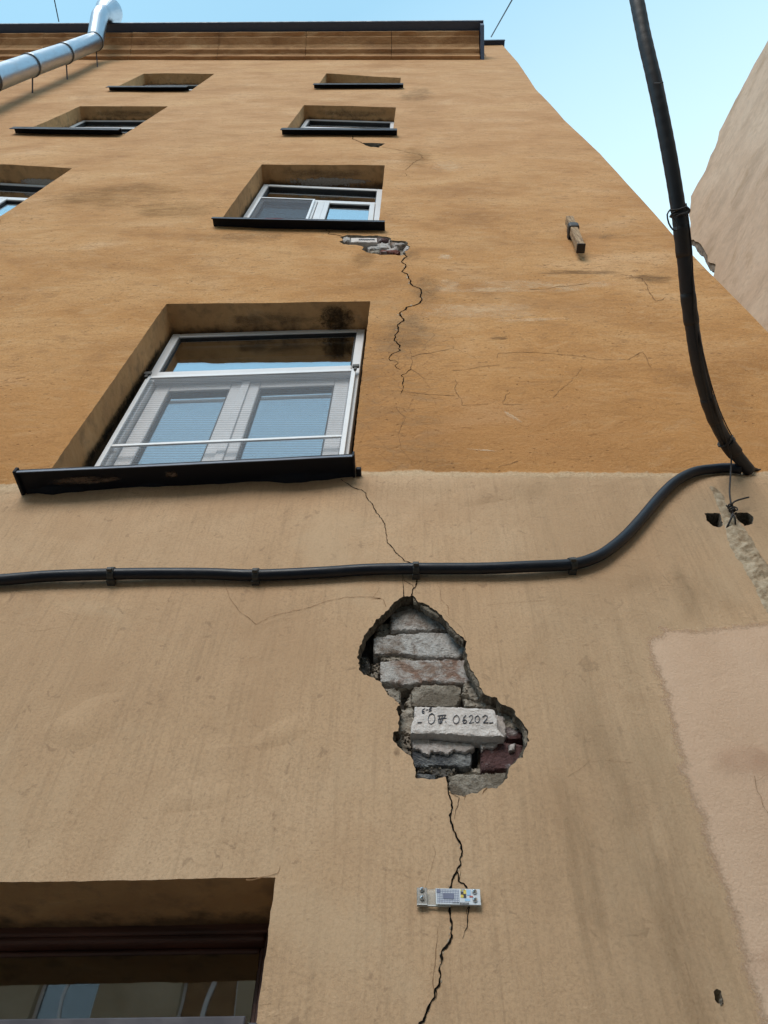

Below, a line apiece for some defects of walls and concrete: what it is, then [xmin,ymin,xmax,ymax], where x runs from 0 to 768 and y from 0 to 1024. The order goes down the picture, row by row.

spalling [339,235,410,255]
crack [389,253,651,450]
spalling [704,513,723,527]
spalling [736,512,754,526]
spalling [357,595,529,797]
crack [418,776,487,1024]